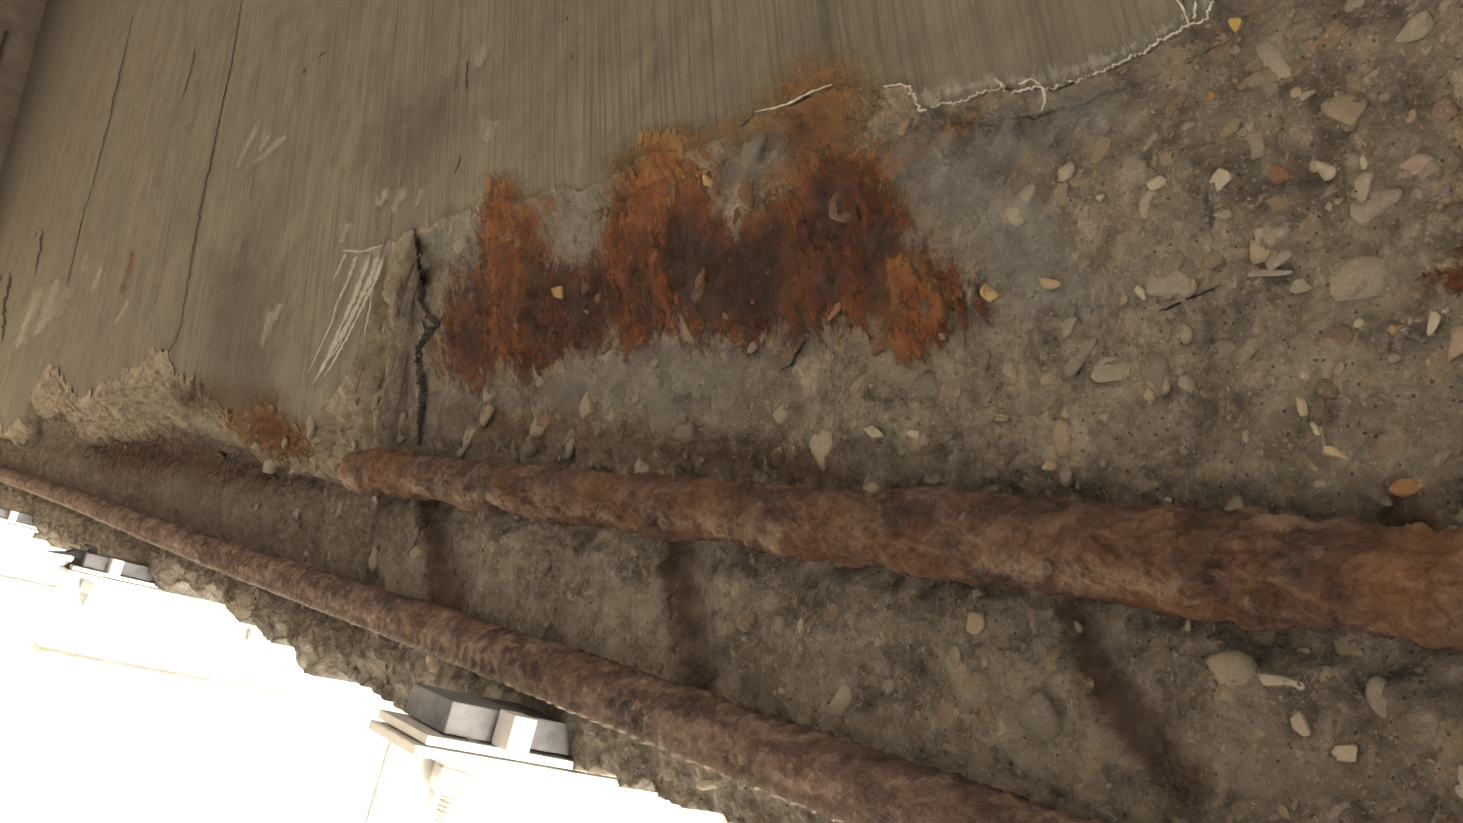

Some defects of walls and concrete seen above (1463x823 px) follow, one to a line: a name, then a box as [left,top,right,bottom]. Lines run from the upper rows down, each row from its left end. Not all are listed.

crack [413,229,445,446]
spalling [497,94,820,315]
corrosion [425,59,992,397]
spalling [829,192,861,224]
spalling [1348,279,1369,298]
corrosion [1423,240,1463,296]
corrosion [479,414,860,487]
corrosion [417,499,460,610]
corrosion [1386,498,1437,530]
spalling [0,481,840,823]
corrosion [662,539,710,691]